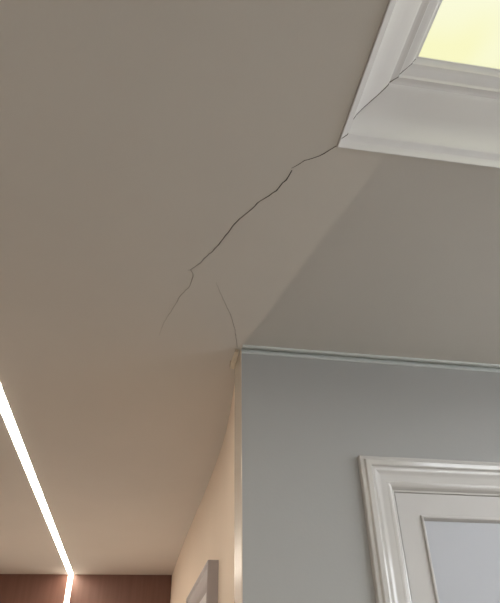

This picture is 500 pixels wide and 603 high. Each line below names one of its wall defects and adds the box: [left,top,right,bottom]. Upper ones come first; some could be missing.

crack [354,59,416,118]
crack [159,134,348,334]